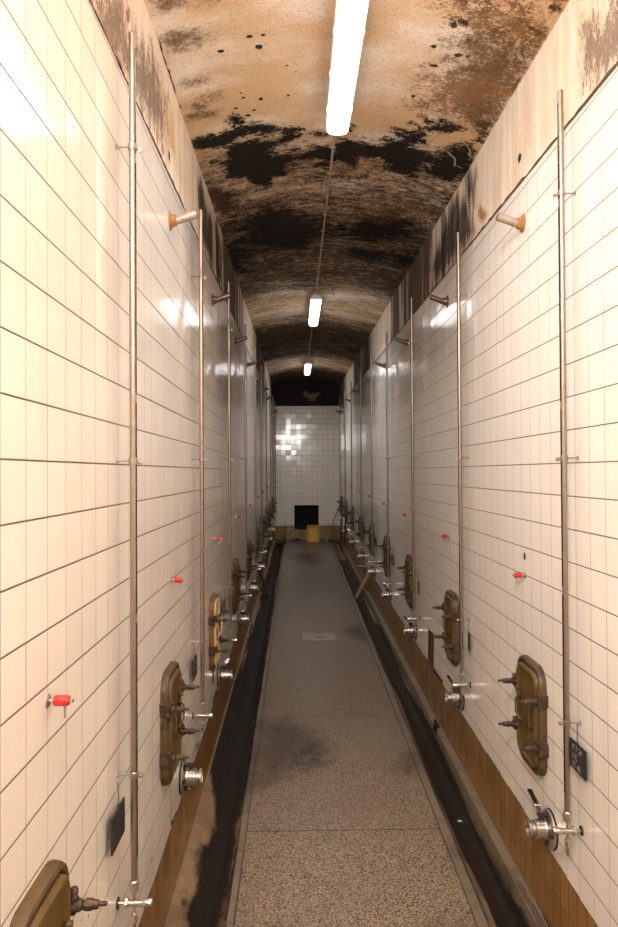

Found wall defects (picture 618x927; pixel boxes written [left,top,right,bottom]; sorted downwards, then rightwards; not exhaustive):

leakage [91,0,207,154]
leakage [186,0,567,283]
leakage [578,0,618,94]